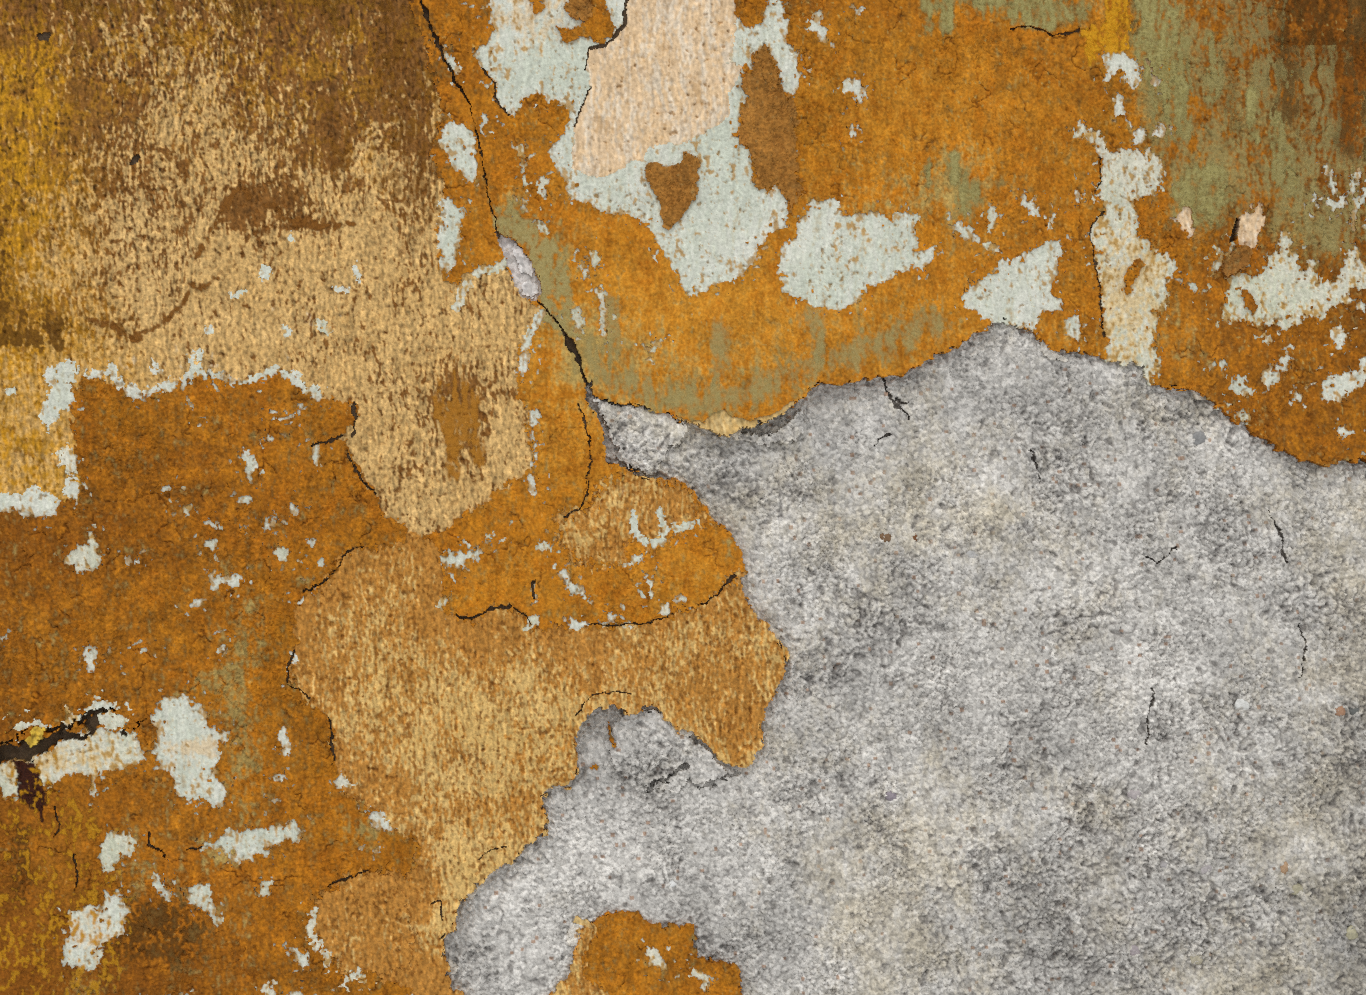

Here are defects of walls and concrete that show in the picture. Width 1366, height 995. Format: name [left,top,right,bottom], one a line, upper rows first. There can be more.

crack [419,0,510,239]
peeling [461,0,944,315]
crack [537,300,594,518]
peeling [1260,343,1295,393]
peeling [1289,356,1366,409]
peeling [161,475,253,598]
crack [454,580,536,625]
crack [588,574,736,628]
crack [0,707,147,764]
peeling [0,680,312,898]
peeling [254,934,325,995]
peeling [636,937,676,971]